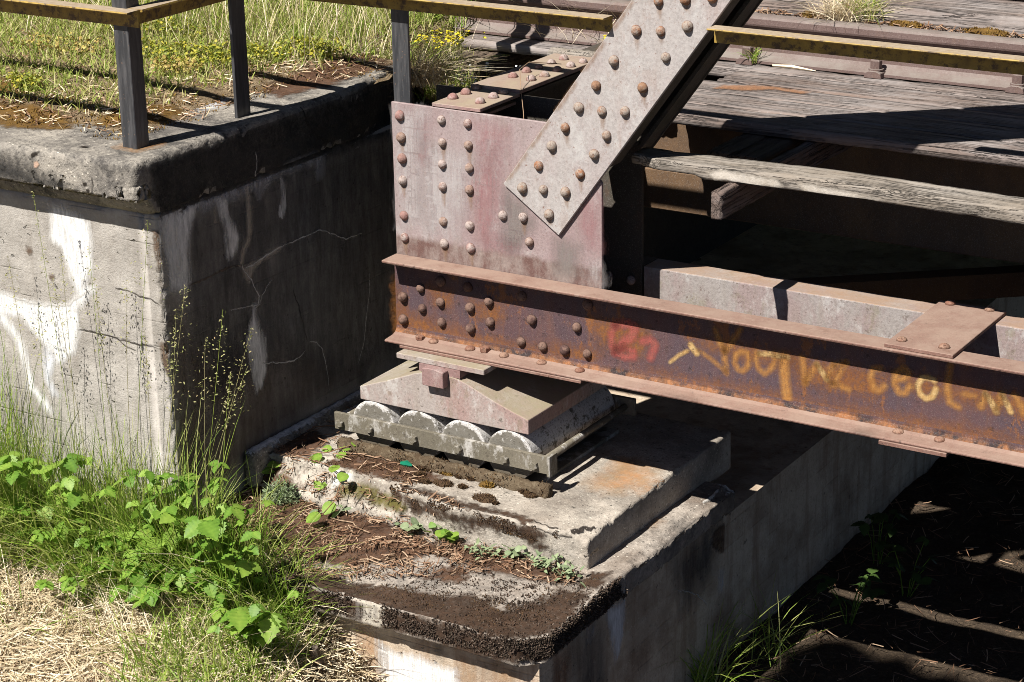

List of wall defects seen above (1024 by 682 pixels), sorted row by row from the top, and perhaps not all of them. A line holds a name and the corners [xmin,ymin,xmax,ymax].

crack [80,329,157,350]
crack [194,230,354,310]
damp [161,140,397,481]
crack [264,290,329,385]